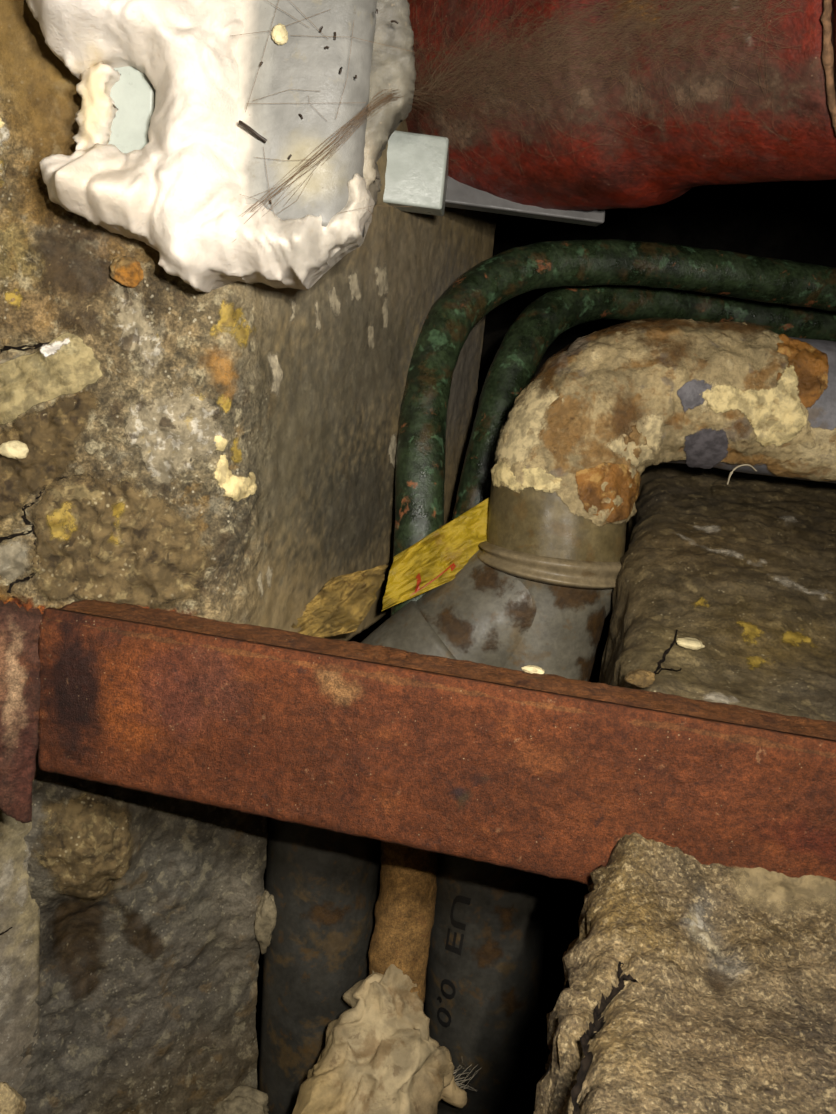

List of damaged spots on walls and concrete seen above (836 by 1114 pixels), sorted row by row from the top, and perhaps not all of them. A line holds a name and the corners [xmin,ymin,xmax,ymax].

crack [0,332,74,353]
spalling [111,282,164,378]
spalling [0,332,257,610]
crack [571,961,643,1114]